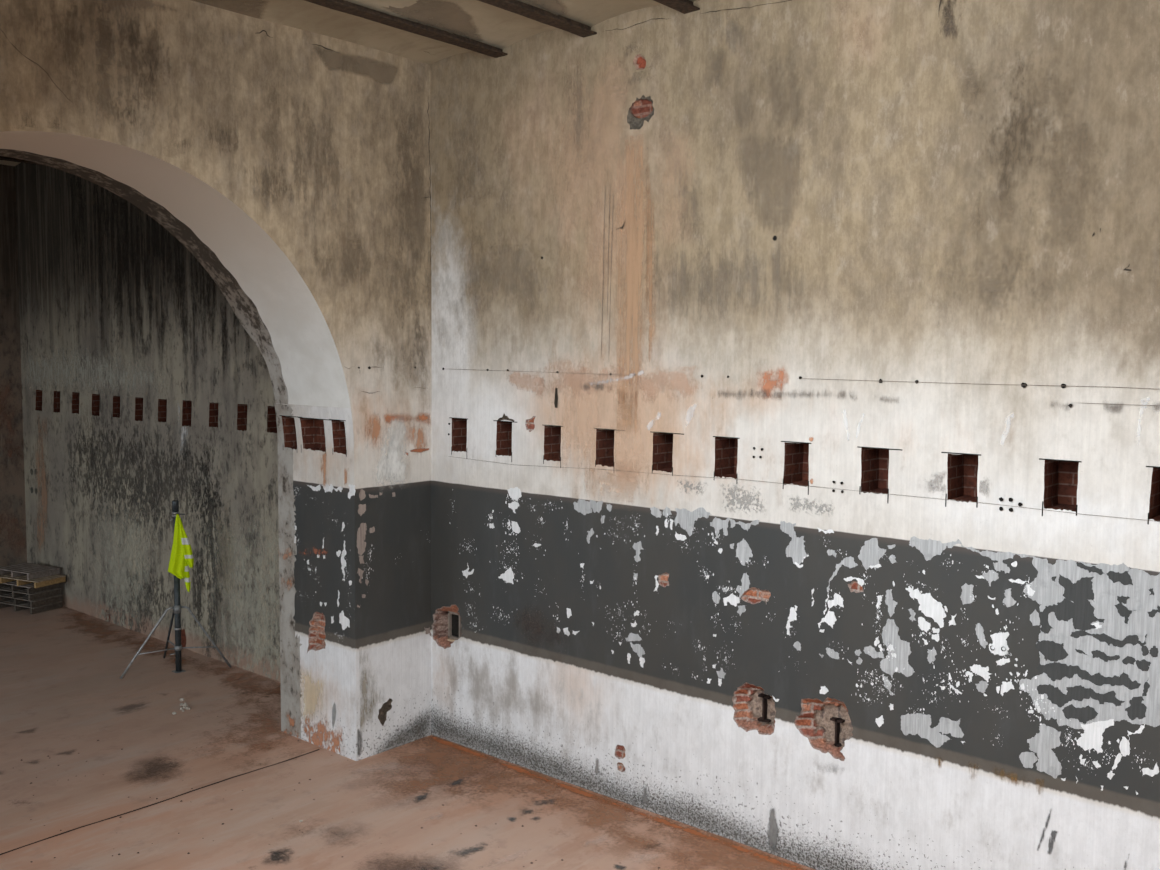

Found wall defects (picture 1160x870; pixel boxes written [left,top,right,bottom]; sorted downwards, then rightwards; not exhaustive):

leakage [389,0,479,40]
leakage [316,48,397,83]
rust [763,371,785,397]
leakage [72,426,222,657]
peeling [294,484,395,653]
peeling [486,487,772,686]
peeling [780,521,809,568]
peeling [785,605,801,671]
peeling [795,527,1160,791]
spalling [732,682,779,735]
leakage [358,673,886,870]
leakage [1038,811,1057,854]